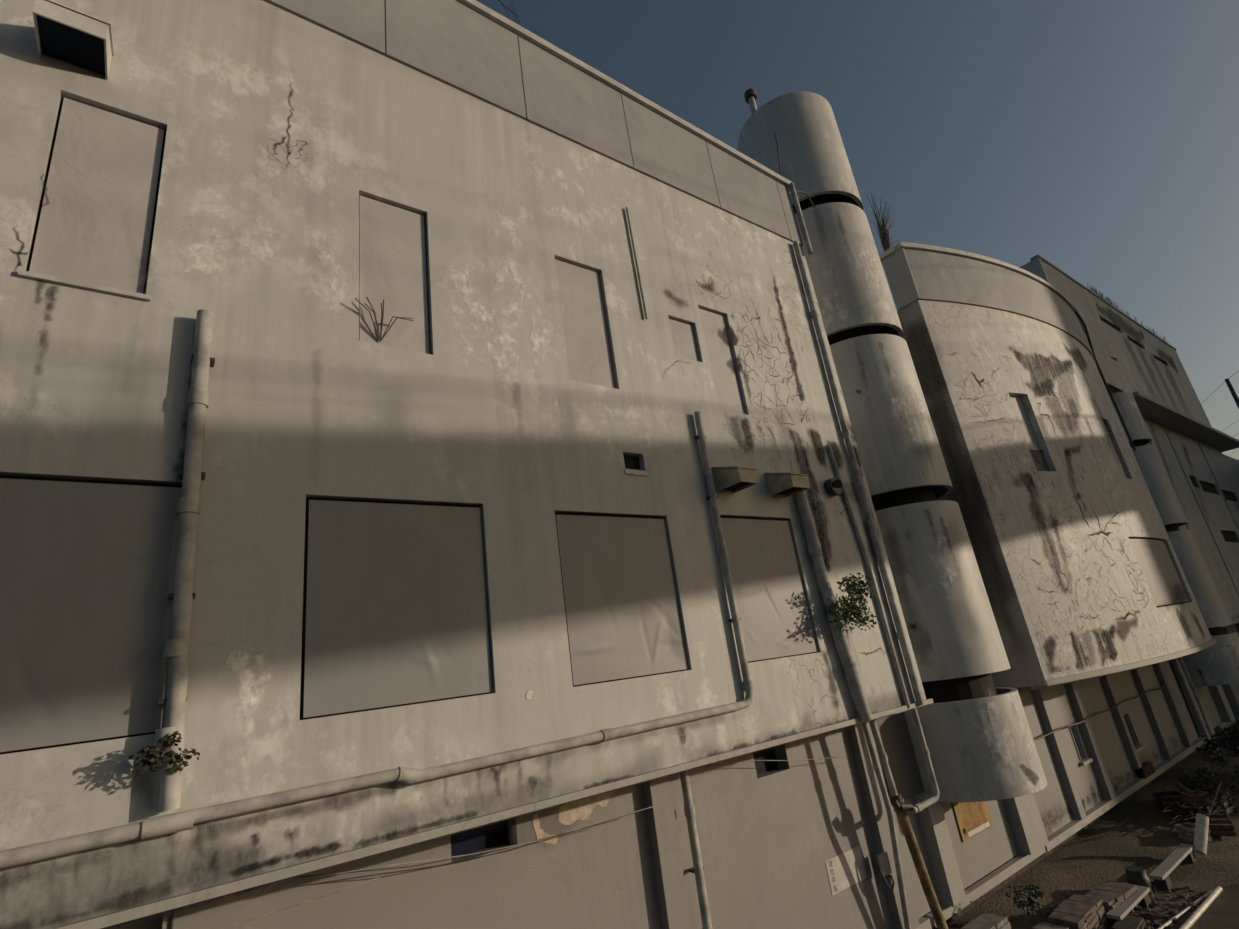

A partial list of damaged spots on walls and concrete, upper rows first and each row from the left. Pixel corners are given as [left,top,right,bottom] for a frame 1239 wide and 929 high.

crack [275,86,301,169]
water stain [1014,345,1087,401]
water stain [790,422,862,572]
water stain [1017,473,1062,585]
water stain [1045,639,1055,672]
water stain [1071,626,1117,668]
water stain [232,857,280,876]
water stain [295,843,340,858]
water stain [360,814,476,847]
flaking render [532,791,615,845]